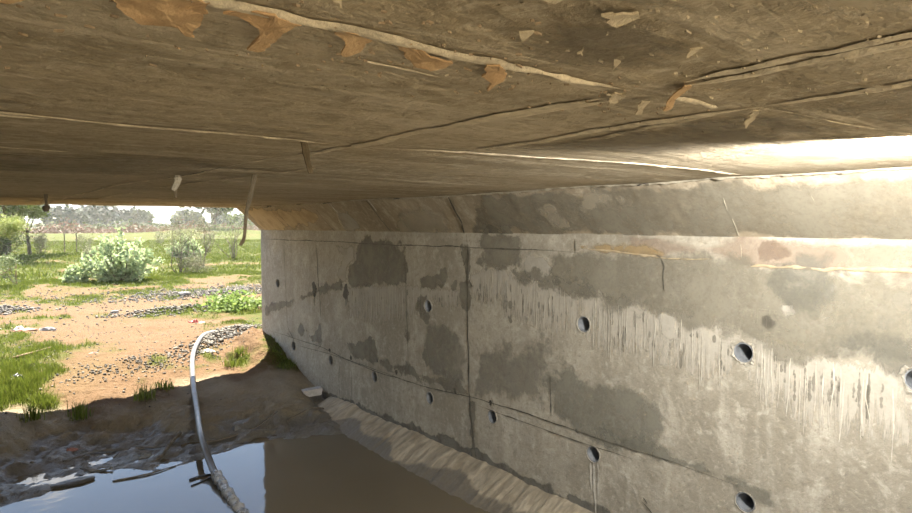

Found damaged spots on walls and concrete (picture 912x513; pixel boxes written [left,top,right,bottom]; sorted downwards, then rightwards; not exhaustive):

peeling [109,0,210,38]
peeling [223,10,302,56]
peeling [318,28,372,63]
peeling [519,19,549,43]
peeling [601,8,659,35]
peeling [387,44,472,94]
peeling [474,53,543,94]
peeling [598,47,702,123]
peeling [735,109,759,128]
damp [265,180,912,513]